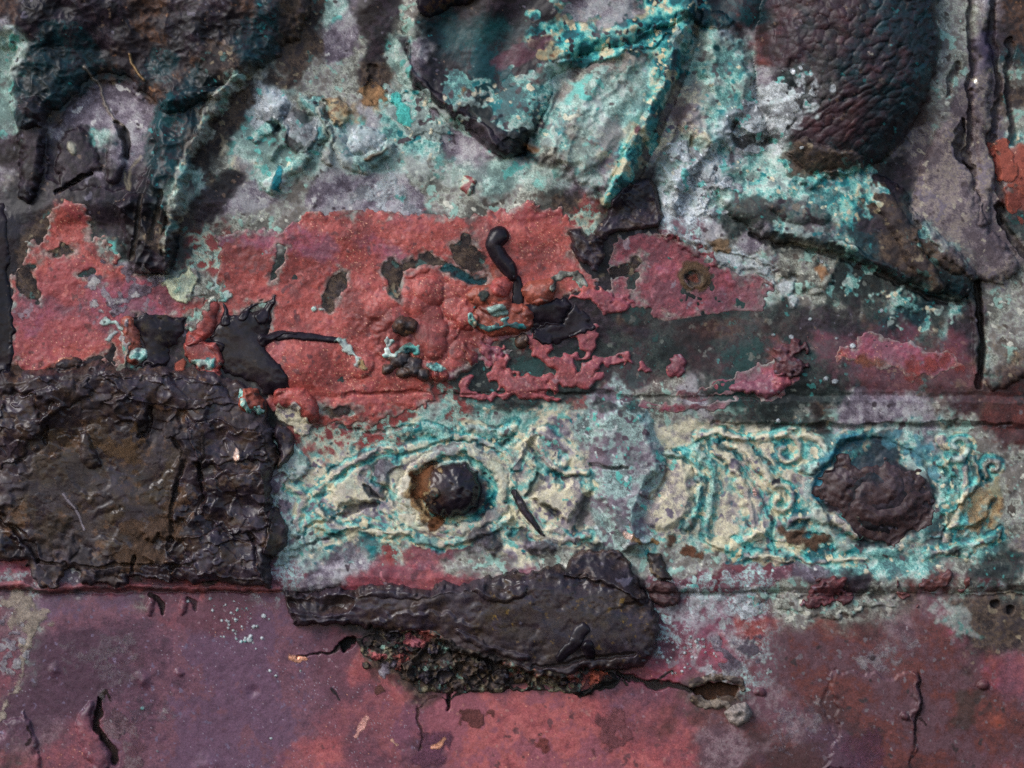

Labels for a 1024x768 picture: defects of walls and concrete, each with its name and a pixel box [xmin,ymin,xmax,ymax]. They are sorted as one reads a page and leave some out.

peeling [9,199,775,427]
peeling [835,331,963,383]
rust [403,461,445,532]
crack [300,643,341,657]
crack [93,689,119,764]
crack [912,674,927,755]